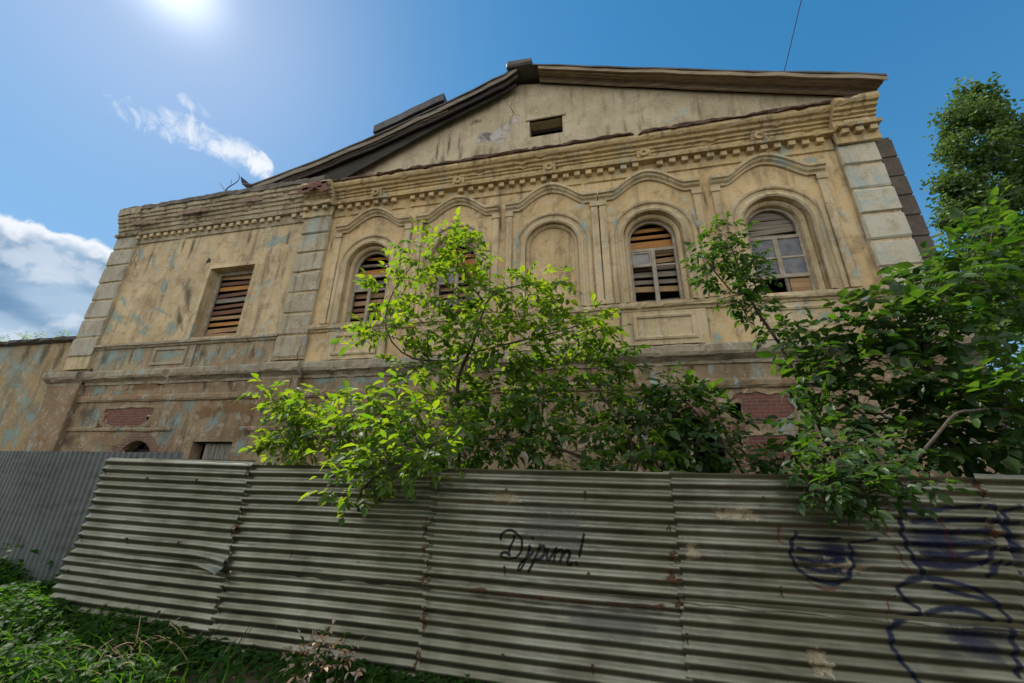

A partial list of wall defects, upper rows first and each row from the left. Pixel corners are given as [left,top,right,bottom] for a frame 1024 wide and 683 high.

spalling [81,391,191,452]
spalling [713,388,805,470]
corrosion [468,587,591,603]
corrosion [606,551,685,609]